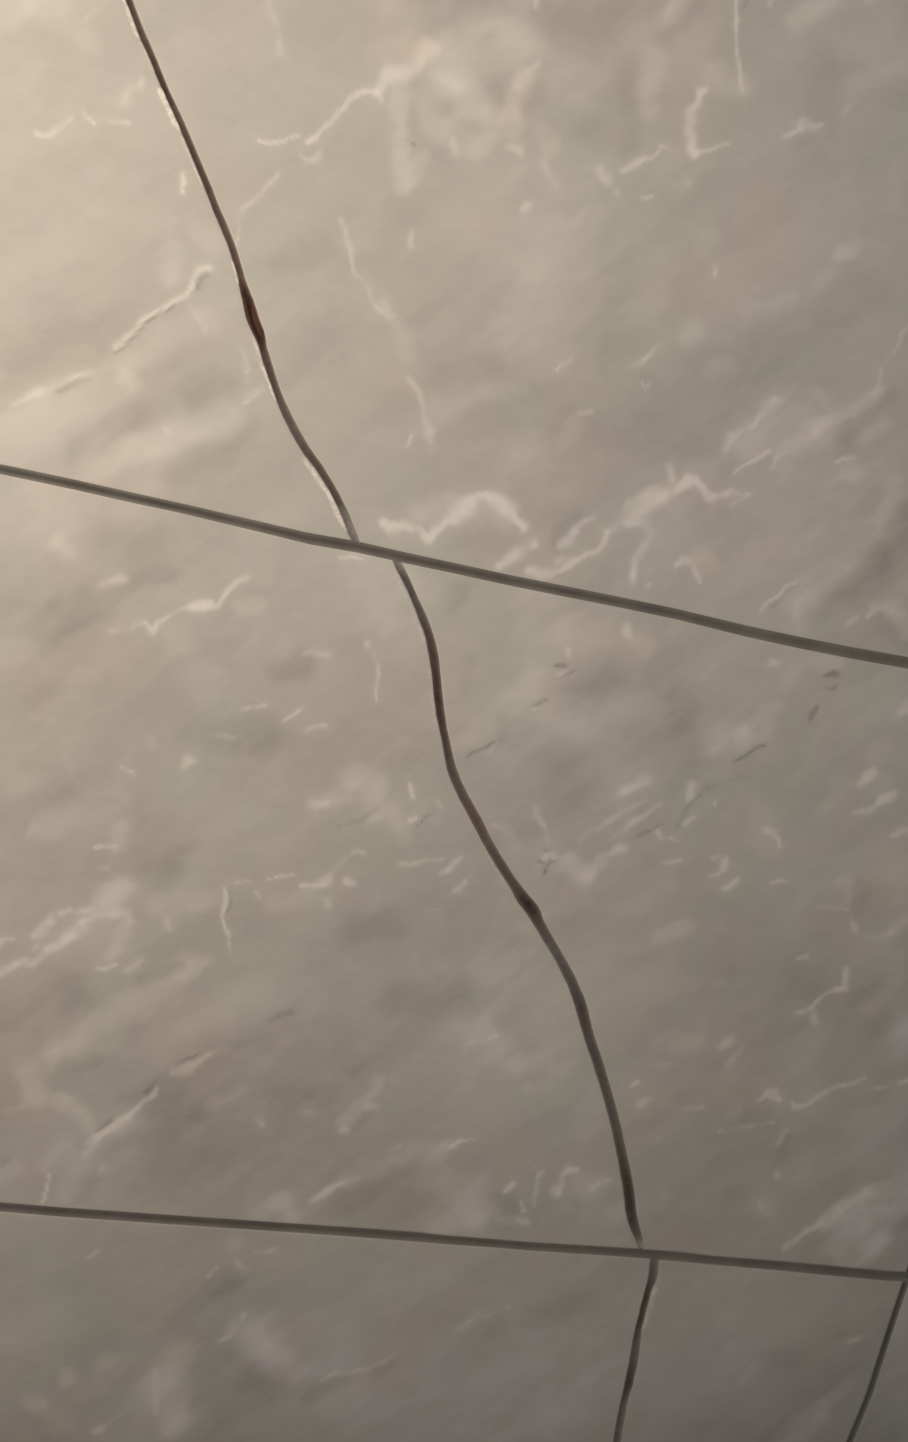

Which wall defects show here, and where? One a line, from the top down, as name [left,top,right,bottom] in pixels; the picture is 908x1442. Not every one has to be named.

crack [123,0,360,543]
crack [393,561,660,1442]